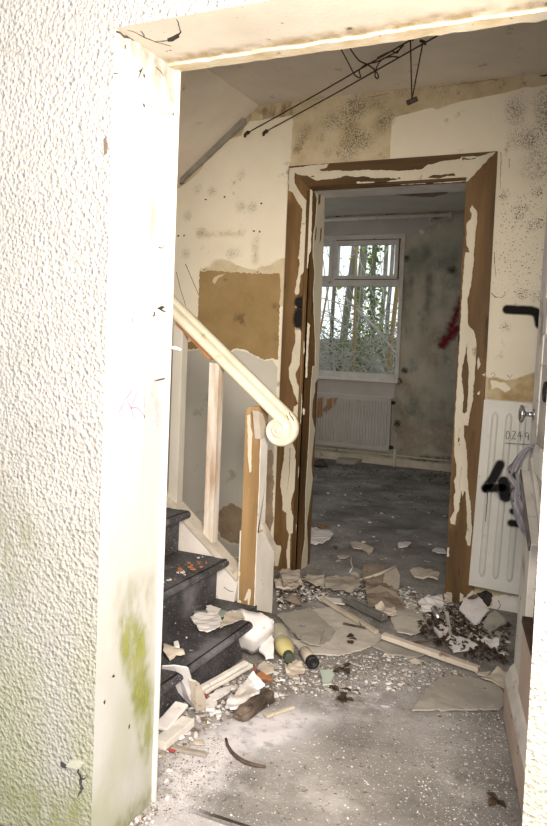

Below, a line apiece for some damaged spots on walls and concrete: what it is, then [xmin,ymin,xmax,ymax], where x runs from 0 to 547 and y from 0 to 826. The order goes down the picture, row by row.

peeling [197,258,285,360]
peeling [265,152,495,569]
peeling [450,205,535,546]
spalling [218,503,242,545]
water stain [122,623,150,741]
crack [60,759,86,797]